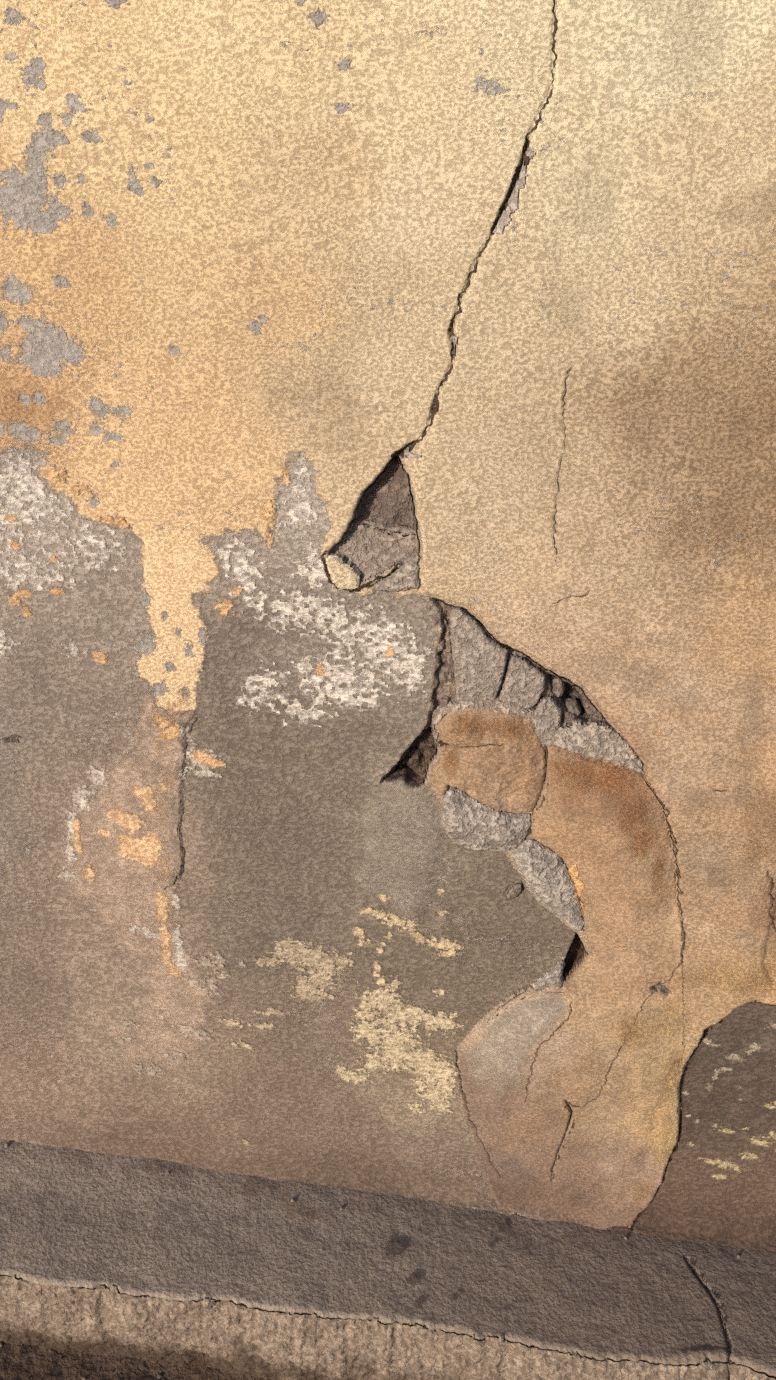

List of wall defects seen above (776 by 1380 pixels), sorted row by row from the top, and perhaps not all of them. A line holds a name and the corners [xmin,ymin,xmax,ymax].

peeling [0,1,46,123]
peeling [279,0,329,51]
peeling [0,63,175,247]
crack [391,0,557,459]
water stain [0,626,21,659]
water stain [0,452,126,591]
water stain [218,465,432,727]
peeling [0,271,643,1219]
crack [487,986,572,1104]
crack [550,752,684,1183]
flaking render [608,1002,776,1252]
crack [685,1255,732,1366]